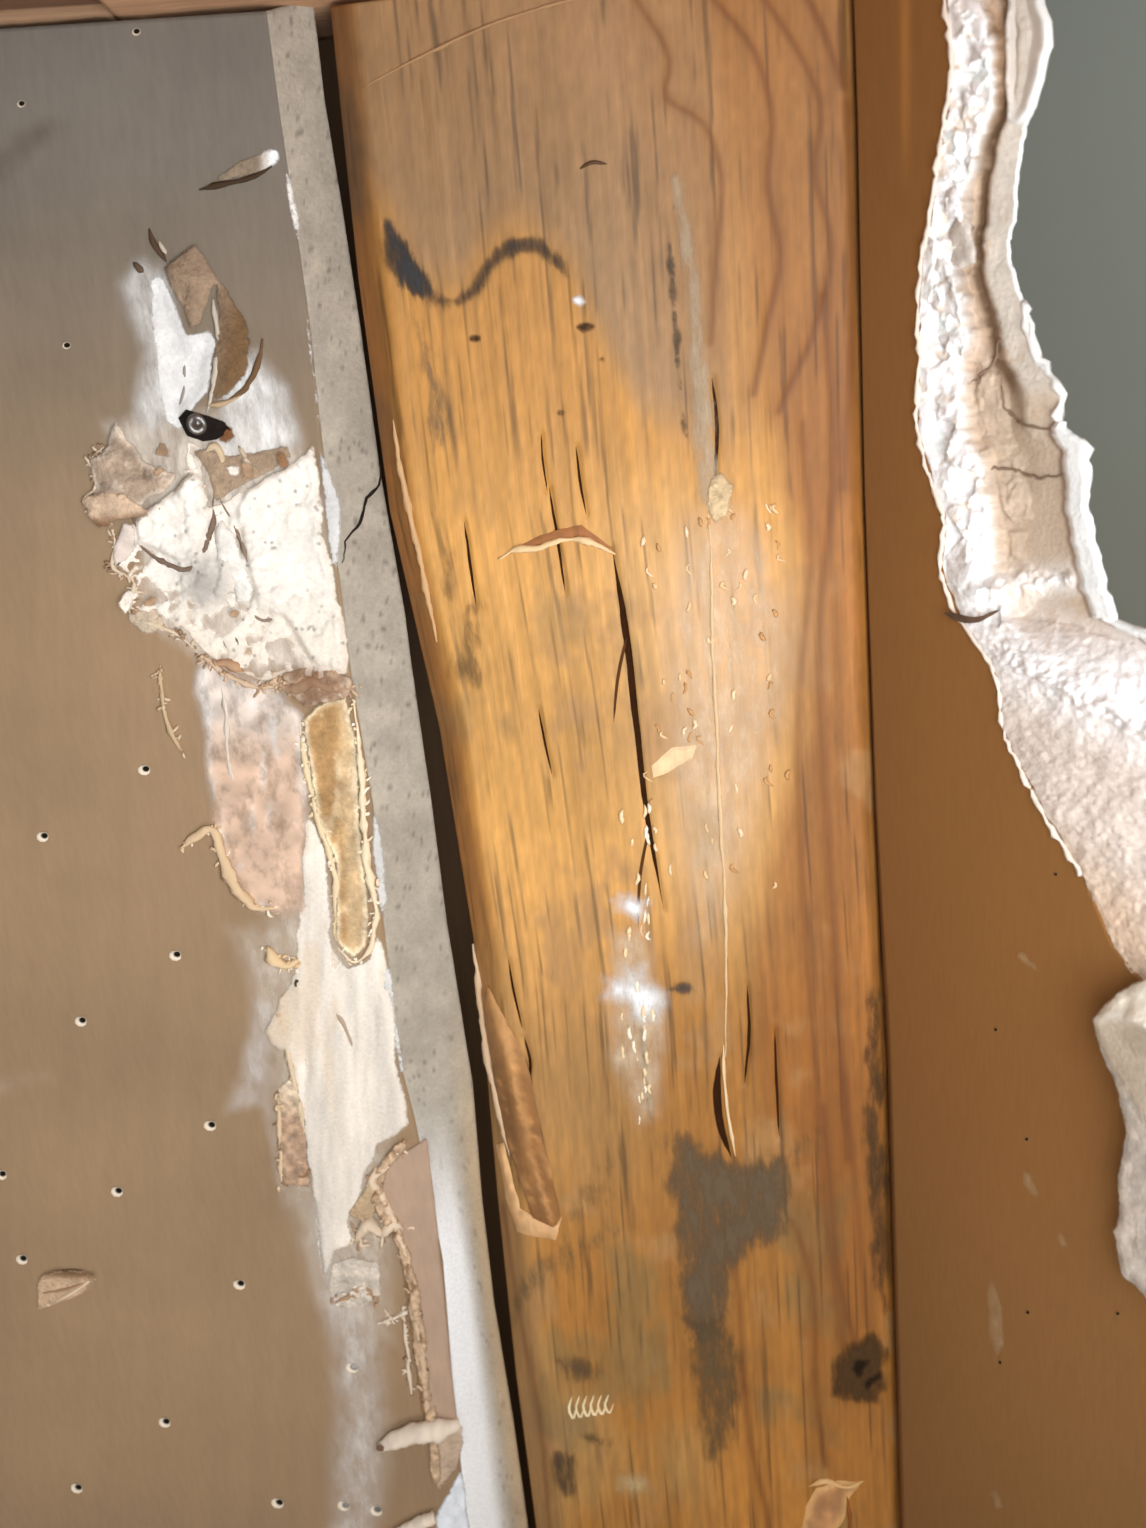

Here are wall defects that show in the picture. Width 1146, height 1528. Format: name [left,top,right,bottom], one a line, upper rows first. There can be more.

leakage [385,221,562,303]
spalling [81,424,349,698]
crack [541,436,586,589]
spalling [912,0,1146,981]
crack [612,549,664,926]
spalling [265,816,409,1272]
spalling [484,986,562,1240]
leakage [669,1137,788,1455]
peeling [376,1418,461,1453]